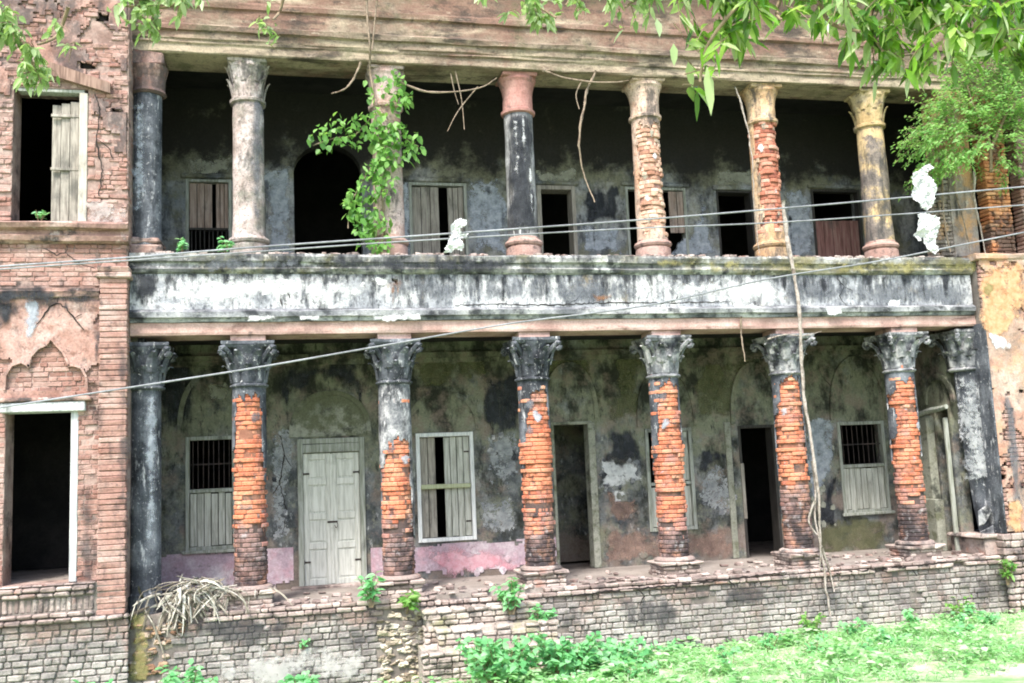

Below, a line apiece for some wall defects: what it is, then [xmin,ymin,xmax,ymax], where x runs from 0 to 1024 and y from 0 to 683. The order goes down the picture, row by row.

water stain [509,115,534,227]
water stain [584,186,619,223]
flaking render [585,121,944,258]
crack [36,297,84,330]
water stain [783,276,963,306]
water stain [161,355,193,425]
flaking render [208,382,293,557]
water stain [484,373,519,435]
flaking render [480,385,555,535]
flaking render [598,374,688,539]
flaking render [774,374,836,501]
flaking render [887,365,926,505]